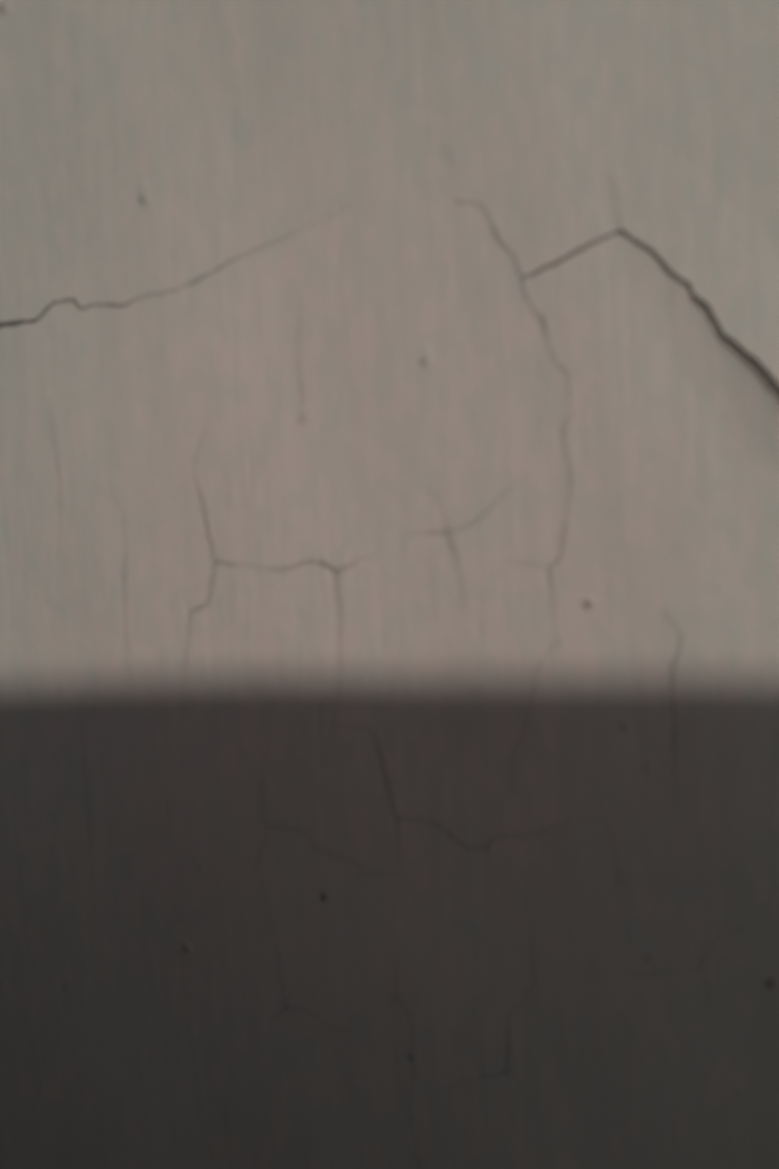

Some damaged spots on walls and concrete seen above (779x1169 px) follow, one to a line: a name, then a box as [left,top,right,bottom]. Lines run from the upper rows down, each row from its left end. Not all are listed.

crack [0,299,75,327]
crack [529,230,779,401]